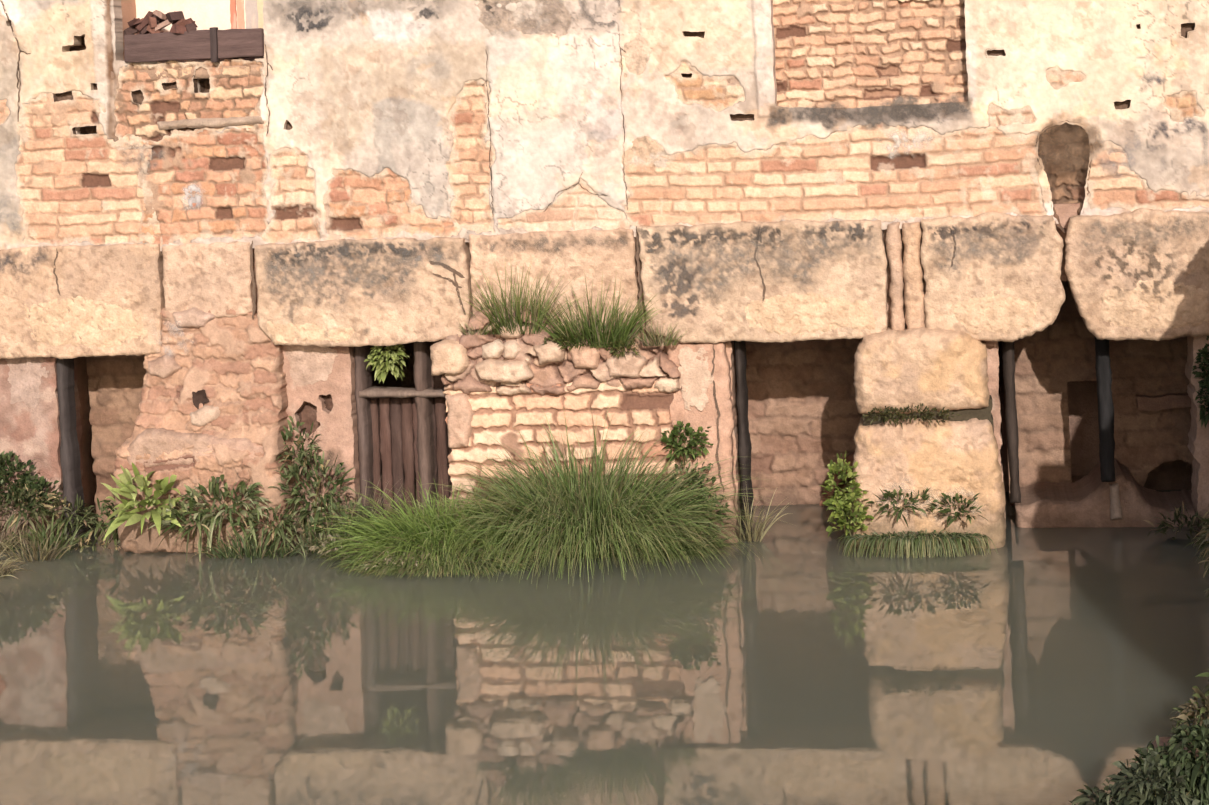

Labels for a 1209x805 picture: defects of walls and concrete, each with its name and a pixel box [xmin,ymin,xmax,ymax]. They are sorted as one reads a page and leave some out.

mould [292,7,329,32]
spalling [1179,23,1195,38]
crack [0,0,30,121]
peeling [621,34,652,78]
spalling [985,48,1006,56]
spalling [1114,100,1131,109]
flaking render [1163,91,1204,122]
flaking render [0,58,1047,246]
flaking render [1086,141,1209,212]